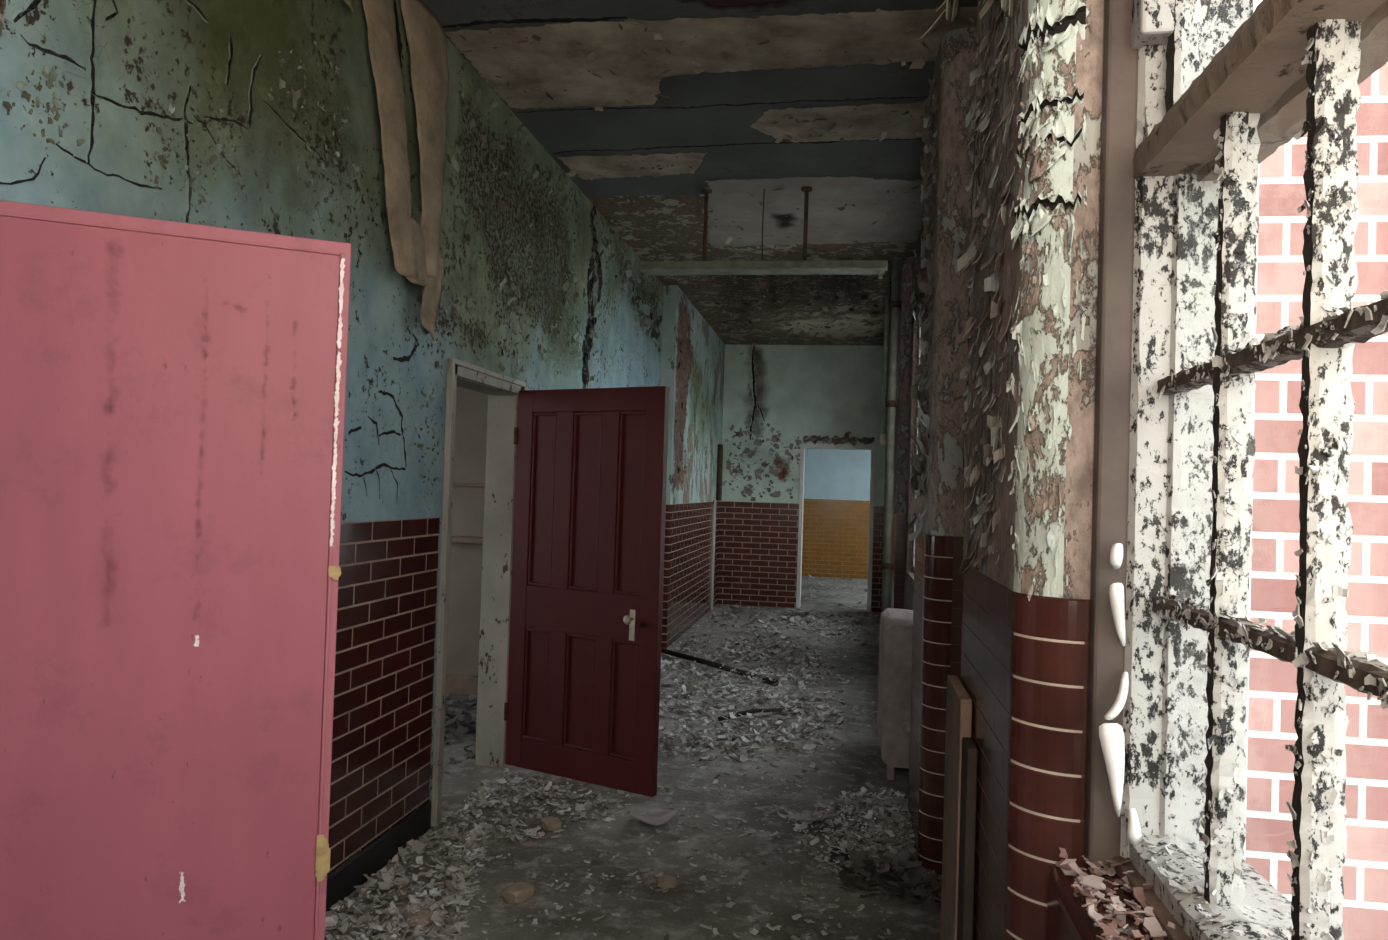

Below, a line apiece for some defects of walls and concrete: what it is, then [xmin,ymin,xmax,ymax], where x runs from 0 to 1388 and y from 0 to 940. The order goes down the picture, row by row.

crack [0,0,329,224]
damp [180,0,339,145]
crack [1012,0,1086,250]
peeling [1301,37,1331,97]
peeling [1293,112,1343,171]
peeling [329,258,345,547]
crack [345,332,421,504]
crack [575,200,606,389]
peeling [344,0,1093,601]
peeling [1158,128,1388,414]
peeling [1295,380,1340,485]
peeling [1099,425,1388,940]